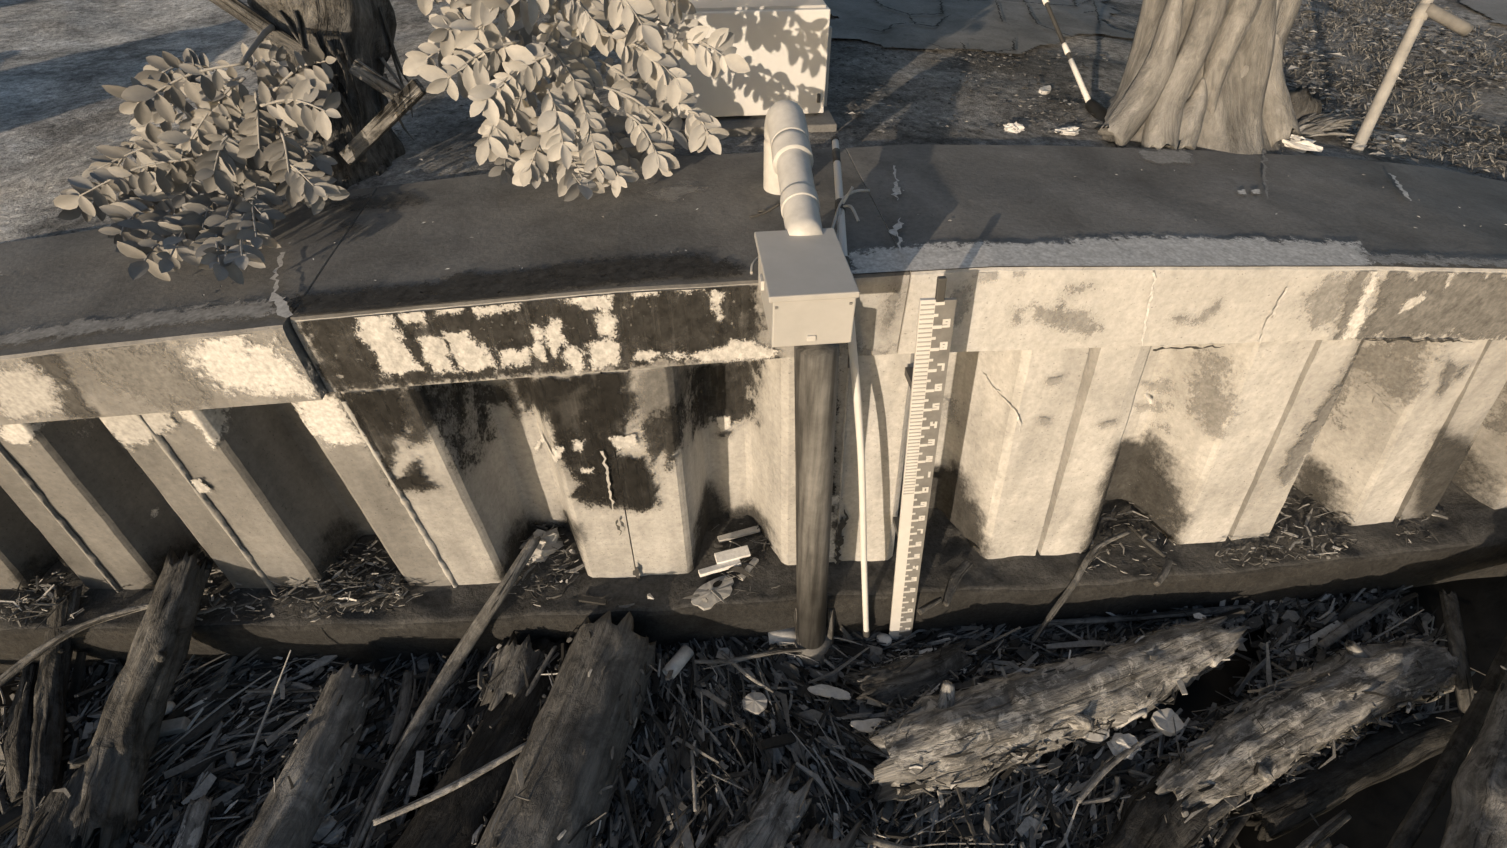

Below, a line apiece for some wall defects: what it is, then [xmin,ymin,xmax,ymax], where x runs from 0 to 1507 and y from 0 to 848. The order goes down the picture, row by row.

leakage [24,343,213,420]
crack [268,252,293,318]
leakage [286,253,782,587]
leakage [1082,349,1240,554]
leakage [1277,271,1507,526]